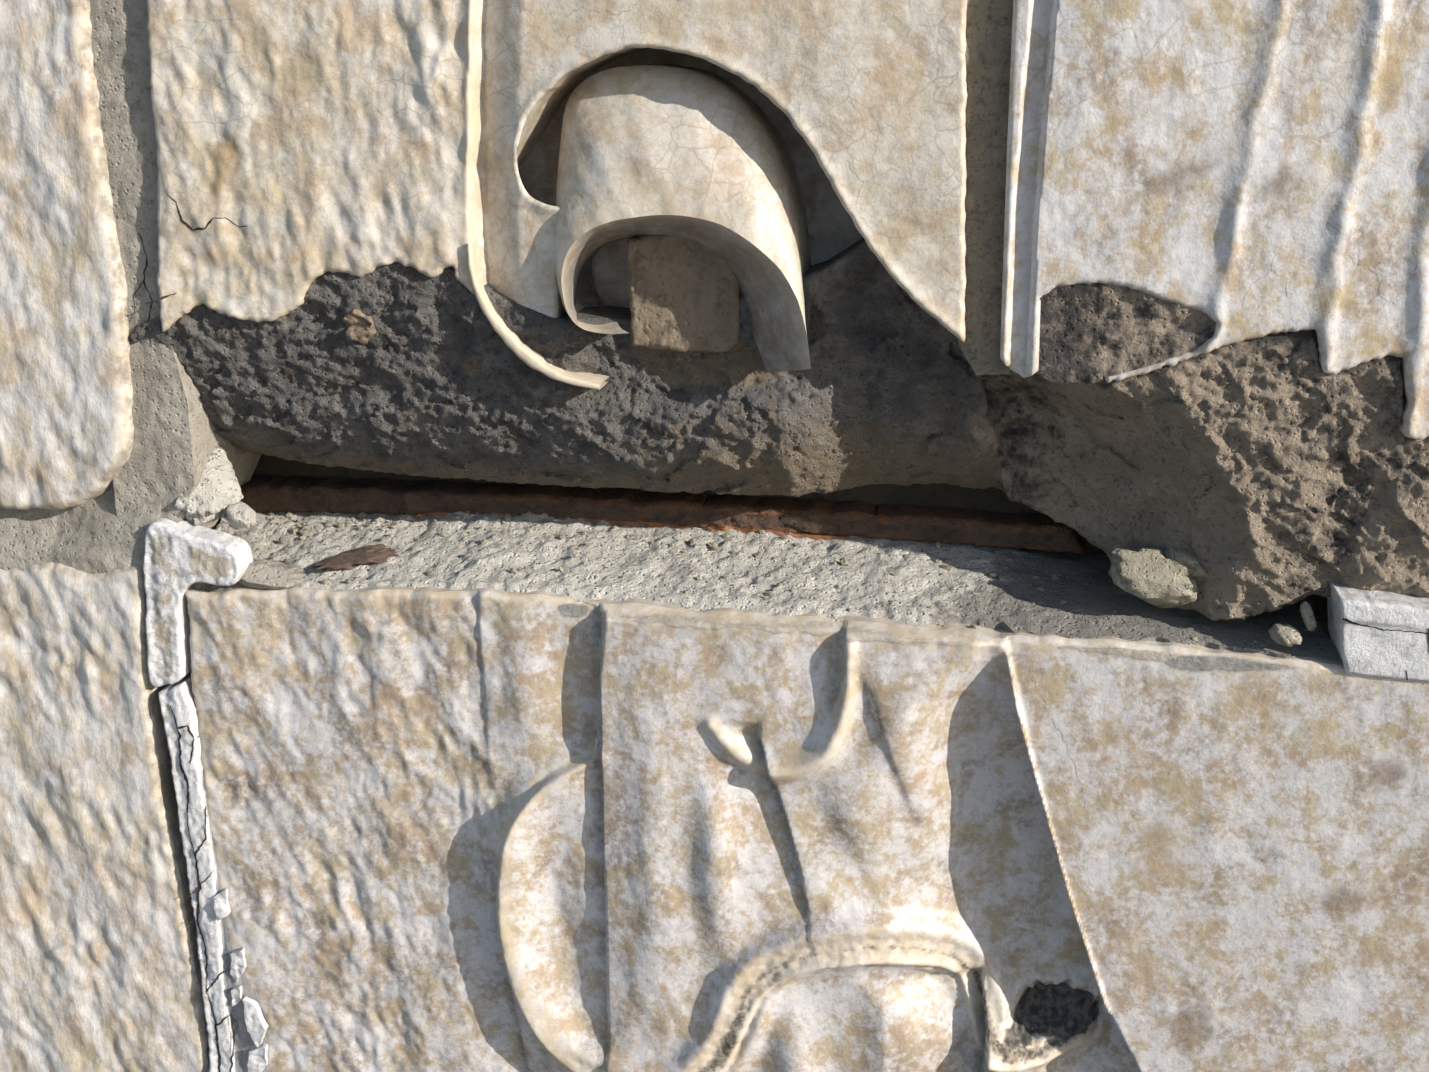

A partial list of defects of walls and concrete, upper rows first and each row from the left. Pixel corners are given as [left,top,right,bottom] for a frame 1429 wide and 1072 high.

crack [167,193,245,231]
crack [133,233,176,347]
spalling [129,238,1429,621]
rust [553,517,689,529]
rust [708,514,868,542]
crack [1342,618,1429,645]
crack [170,706,236,1072]